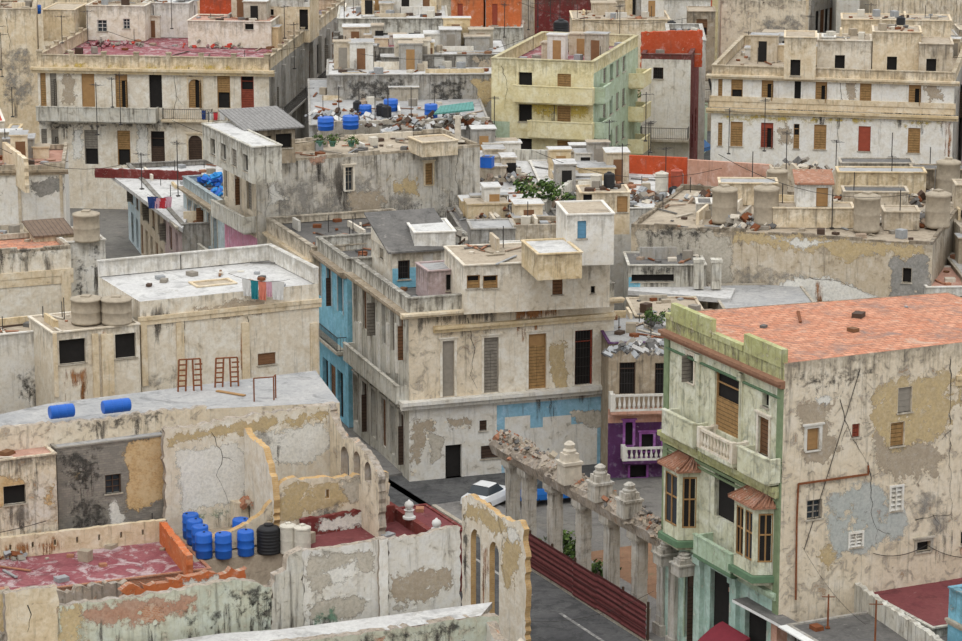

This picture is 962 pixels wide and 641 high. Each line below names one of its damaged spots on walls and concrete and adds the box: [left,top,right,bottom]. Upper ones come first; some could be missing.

spalling [0,475,30,508]
flaking render [108,407,330,524]
flaking render [409,417,472,476]
flaking render [815,482,908,571]
flaking render [869,368,962,485]
flaking render [303,549,375,621]
flaking render [389,566,454,611]